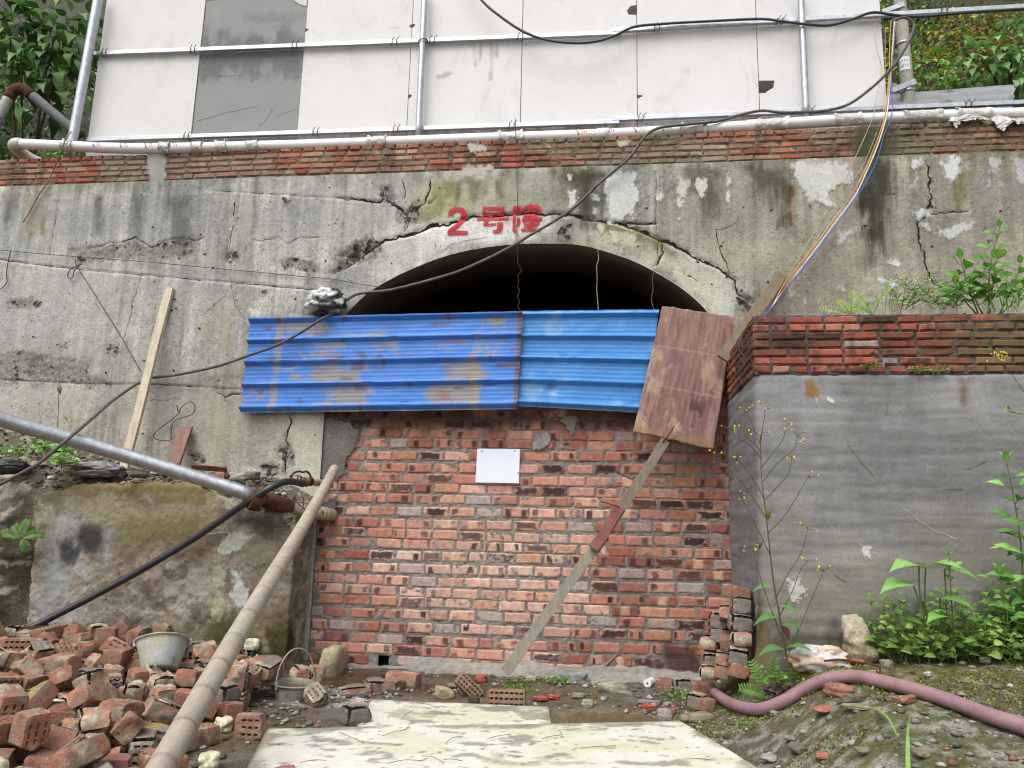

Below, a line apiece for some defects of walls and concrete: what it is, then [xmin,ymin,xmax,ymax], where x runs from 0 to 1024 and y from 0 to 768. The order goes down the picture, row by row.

crack [92,237,203,248]
crack [332,180,742,297]
peeling [567,174,577,208]
peeling [590,171,639,248]
peeling [791,160,853,208]
peeling [837,230,852,244]
crack [916,163,966,288]
peeling [916,208,976,240]
peeling [939,154,962,182]
peeling [671,262,699,301]
crack [284,416,292,473]
leakage [45,526,113,615]